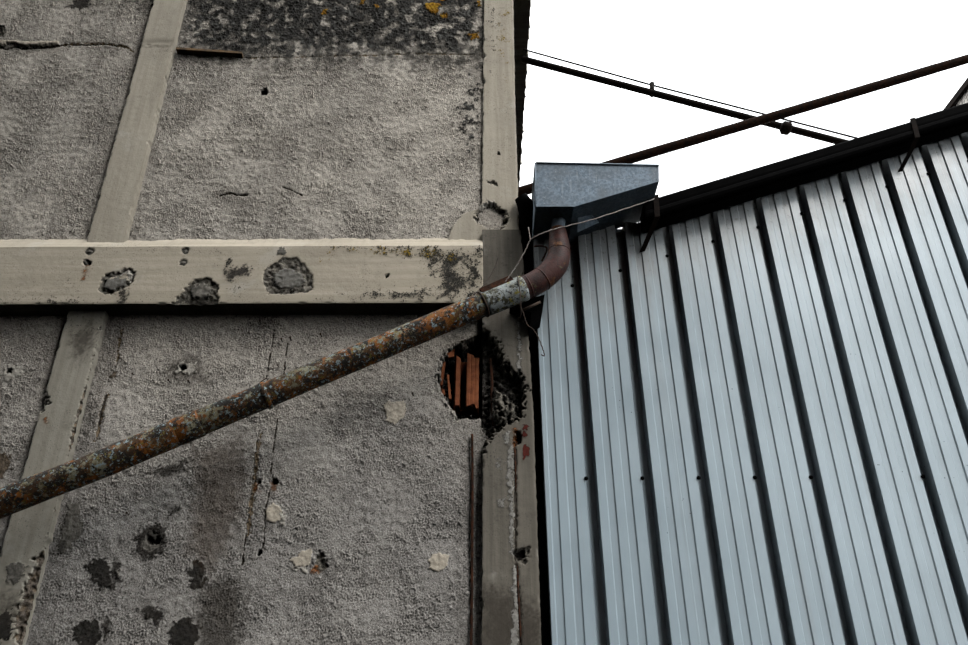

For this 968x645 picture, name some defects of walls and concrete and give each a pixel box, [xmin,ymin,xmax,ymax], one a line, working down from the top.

crack [0,40,134,52]
damp [184,0,503,162]
spalling [98,268,136,303]
spalling [172,278,219,306]
spalling [435,333,525,447]